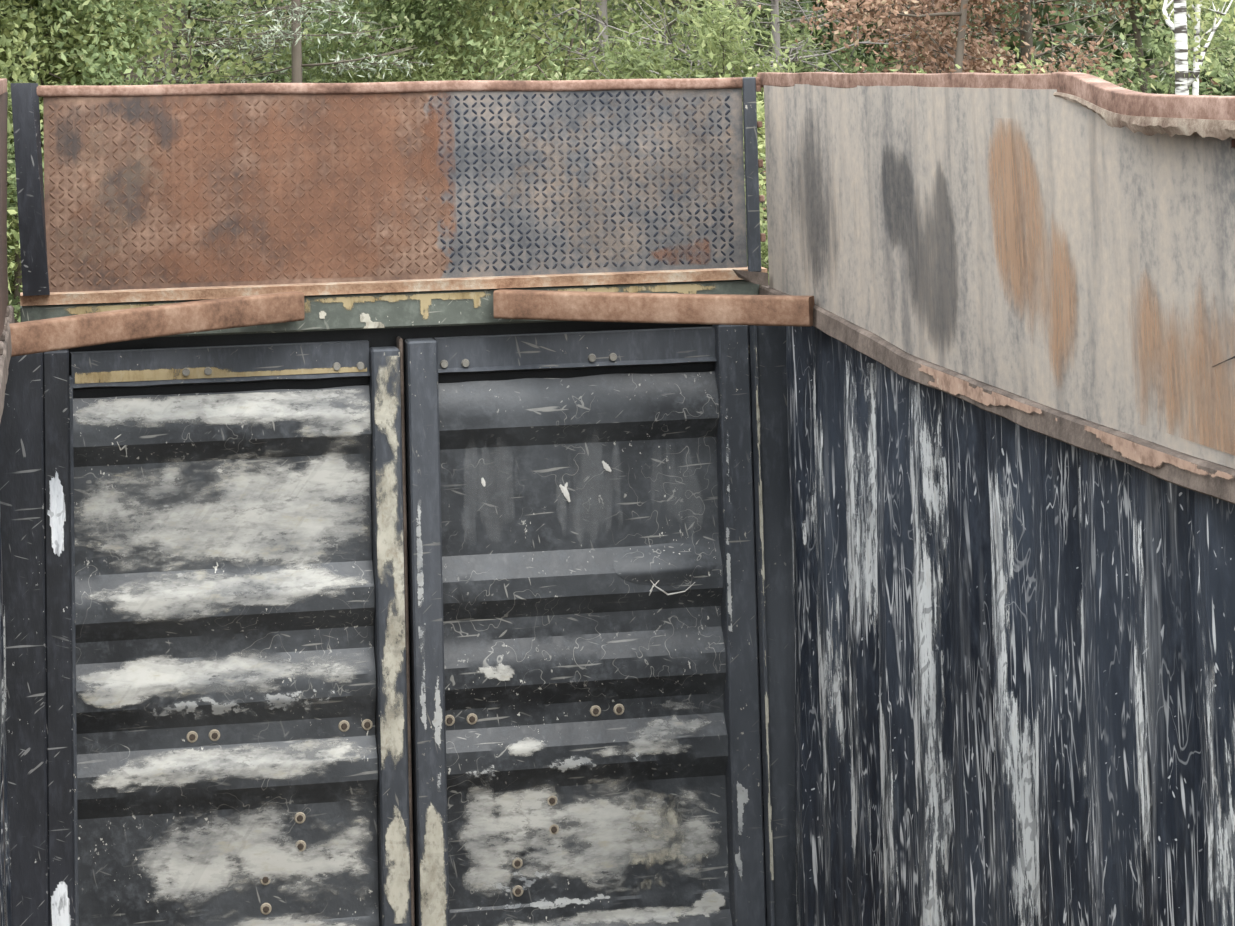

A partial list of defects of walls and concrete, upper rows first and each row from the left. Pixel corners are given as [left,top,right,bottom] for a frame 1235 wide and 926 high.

peeling [360,313,385,328]
corrosion [918,364,1057,421]
peeling [756,386,765,596]
corrosion [1084,425,1233,480]
peeling [47,356,442,764]
peeling [95,740,360,792]
peeling [139,802,369,905]
peeling [385,803,447,926]
peeling [459,705,725,926]
peeling [735,781,749,877]
peeling [765,692,774,880]
peeling [235,915,355,926]